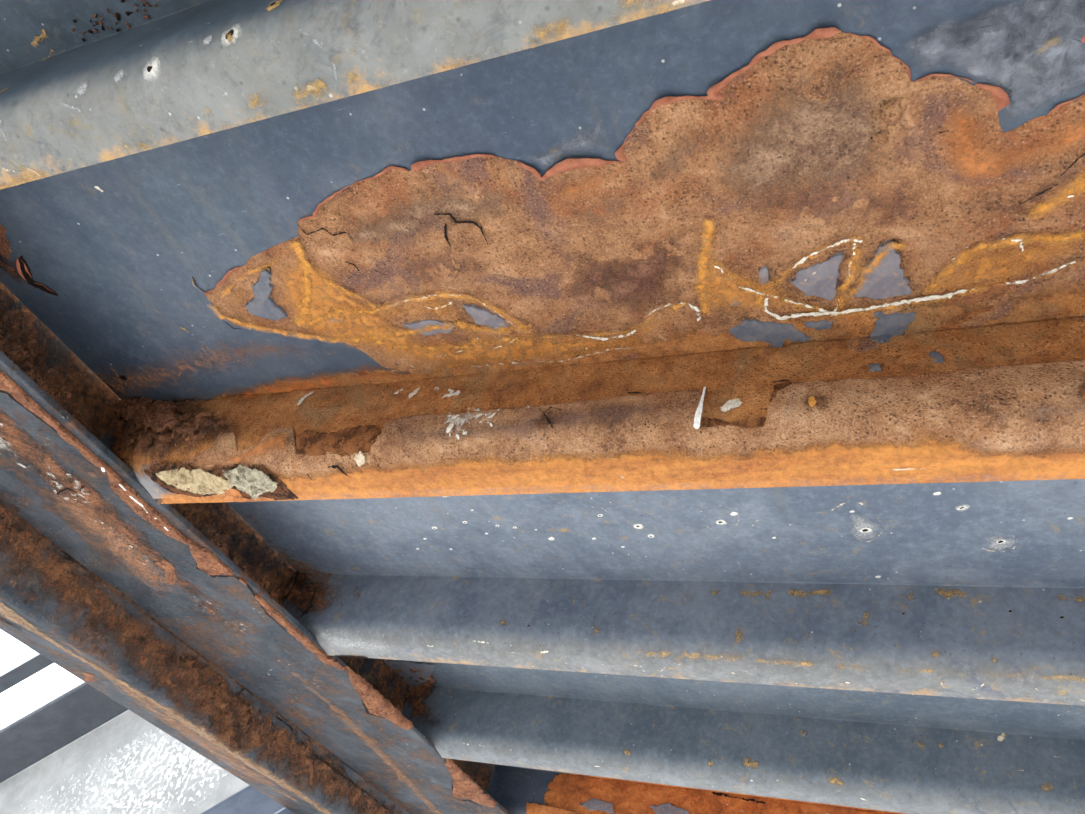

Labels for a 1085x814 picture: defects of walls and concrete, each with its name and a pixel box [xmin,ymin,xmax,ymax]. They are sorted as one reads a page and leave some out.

rust [71,0,157,42]
rust [0,166,45,190]
rust [94,27,1085,474]
rust [0,312,92,425]
rust [0,413,218,614]
rust [161,440,1085,504]
rust [0,501,395,814]
rust [293,668,443,814]
rust [544,773,906,814]